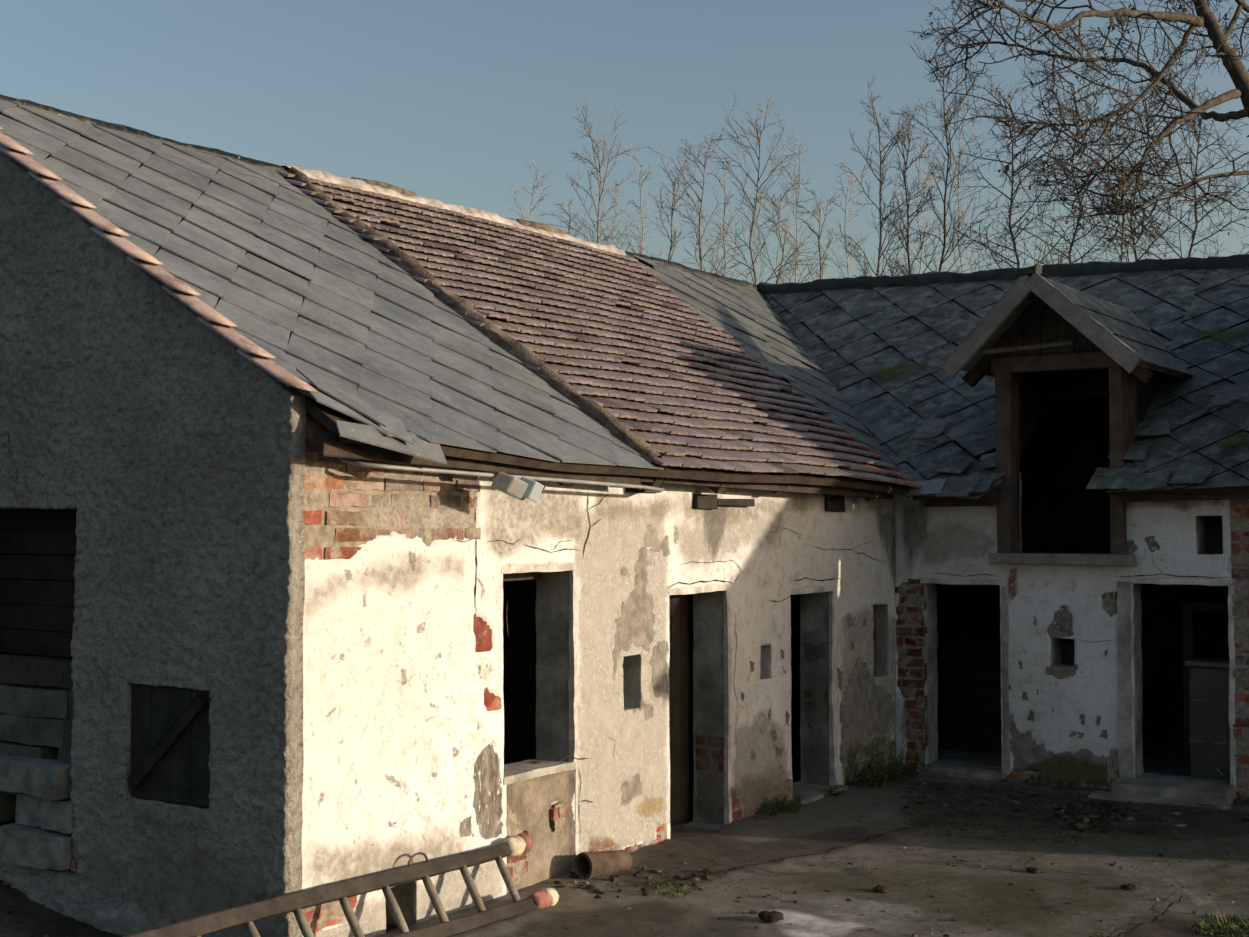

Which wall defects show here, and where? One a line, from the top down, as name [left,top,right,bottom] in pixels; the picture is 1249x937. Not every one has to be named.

flaking render [304,411,481,580]
crack [456,476,606,636]
crack [767,528,887,602]
spalling [1033,605,1074,639]
flaking render [1102,592,1118,617]
flaking render [473,614,502,711]
flaking render [803,578,925,785]
spalling [1046,664,1078,679]
peeling [460,744,529,839]
peeling [417,853,528,919]
damp [628,820,883,886]